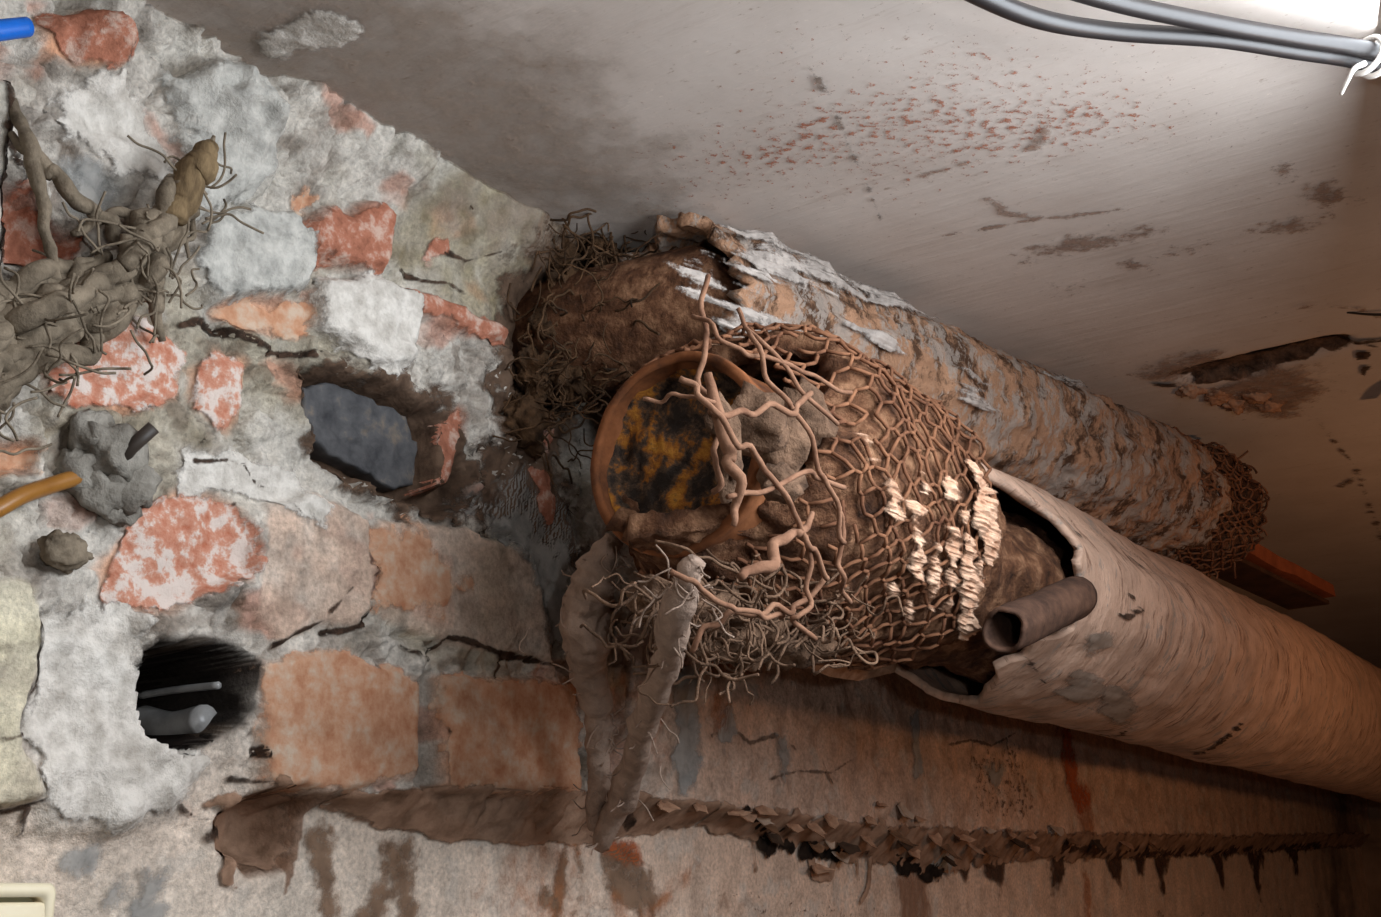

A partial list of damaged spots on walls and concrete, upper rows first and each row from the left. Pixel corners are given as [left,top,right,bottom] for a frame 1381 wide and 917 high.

peeling [257,10,364,61]
spalling [291,186,397,276]
spalling [210,296,316,340]
spalling [48,317,244,431]
spalling [1137,334,1381,419]
spalling [100,356,581,647]
spalling [135,646,222,749]
crack [271,587,373,649]
crack [400,635,555,678]
spalling [204,650,584,889]
rust [1061,727,1093,831]
damp [899,875,930,917]